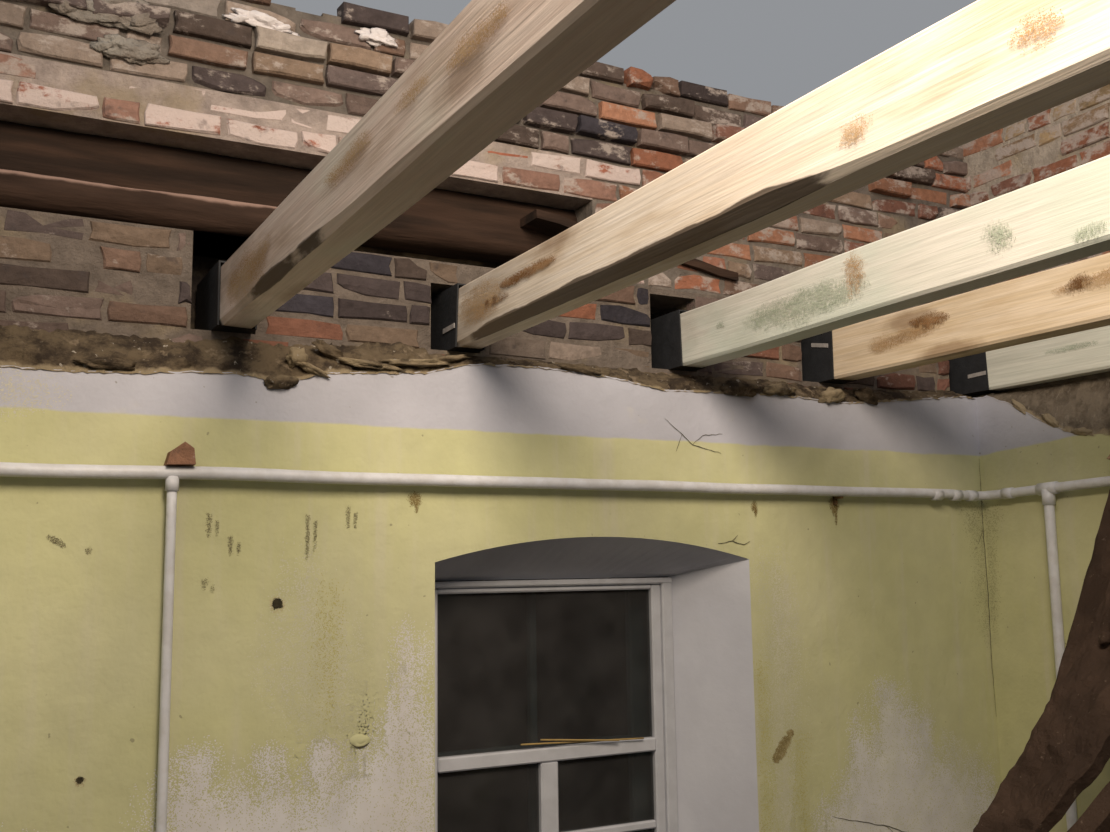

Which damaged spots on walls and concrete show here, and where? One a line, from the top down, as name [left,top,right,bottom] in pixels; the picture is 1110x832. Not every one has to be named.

spalling [0,324,974,406]
flaking render [1041,413,1093,436]